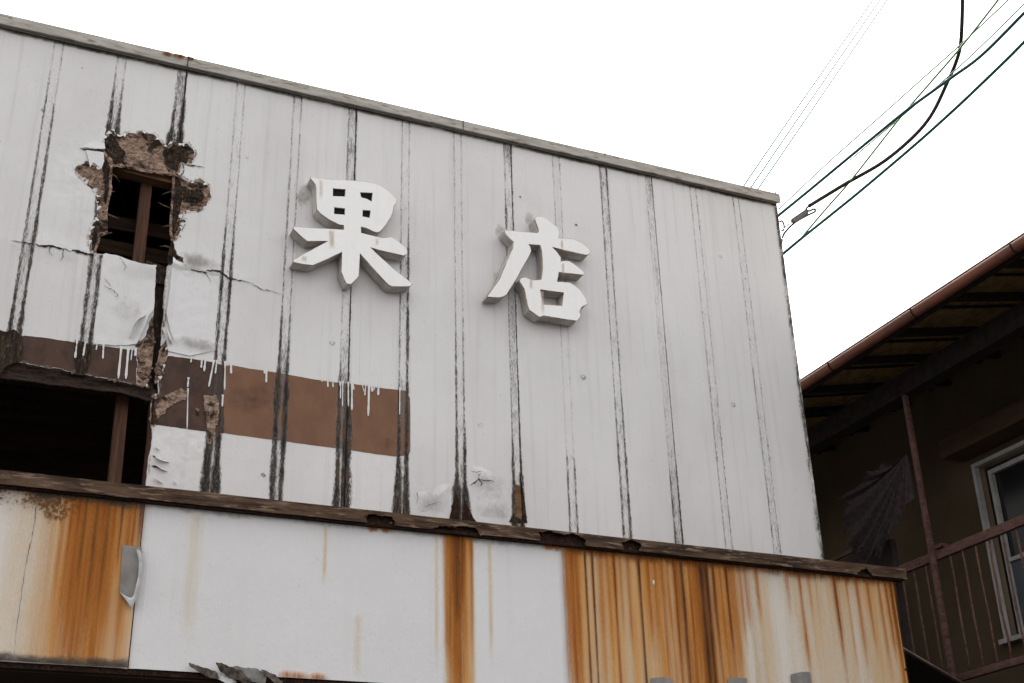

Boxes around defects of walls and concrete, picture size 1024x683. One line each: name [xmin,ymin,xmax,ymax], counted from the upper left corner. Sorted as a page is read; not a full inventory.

crack [10,240,93,258]
peeling [0,128,222,427]
crack [183,264,281,295]
water stain [0,27,813,543]
peeling [195,395,219,444]
corrosion [0,489,144,666]
corrosion [445,527,474,683]
corrosion [543,532,908,683]